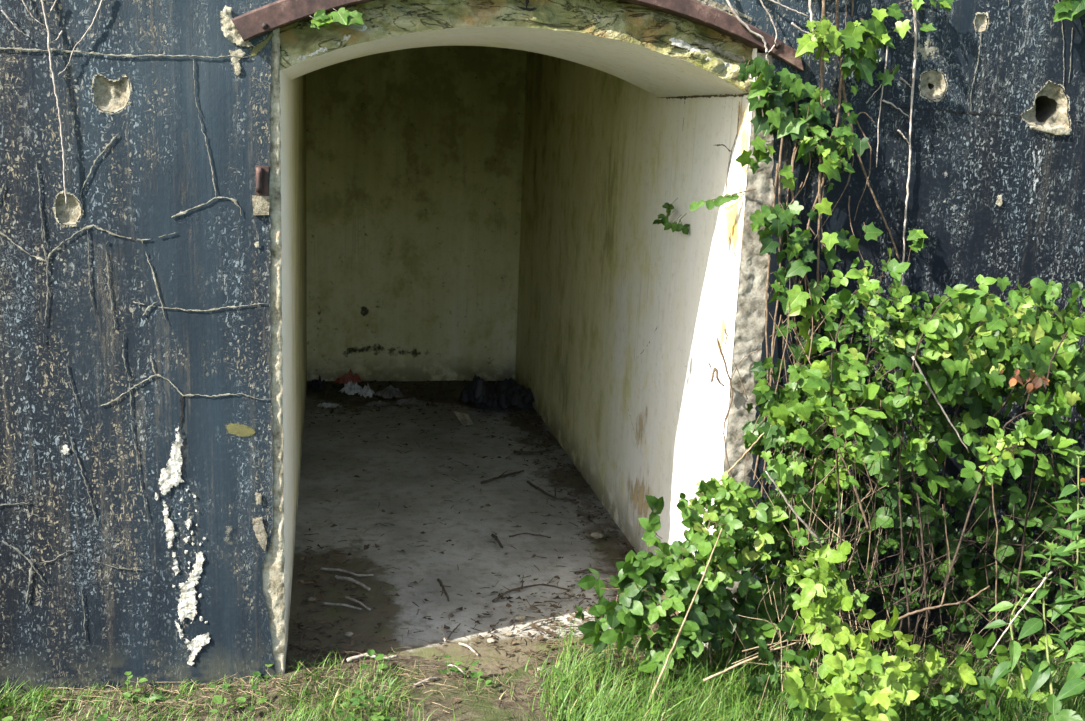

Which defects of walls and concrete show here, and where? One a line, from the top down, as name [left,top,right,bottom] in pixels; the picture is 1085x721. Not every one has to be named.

spalling [91,73,133,115]
spalling [221,5,253,77]
spalling [917,39,949,102]
spalling [973,12,990,32]
spalling [1021,80,1072,135]
spalling [52,191,84,227]
rust [724,110,749,250]
spalling [1028,146,1044,217]